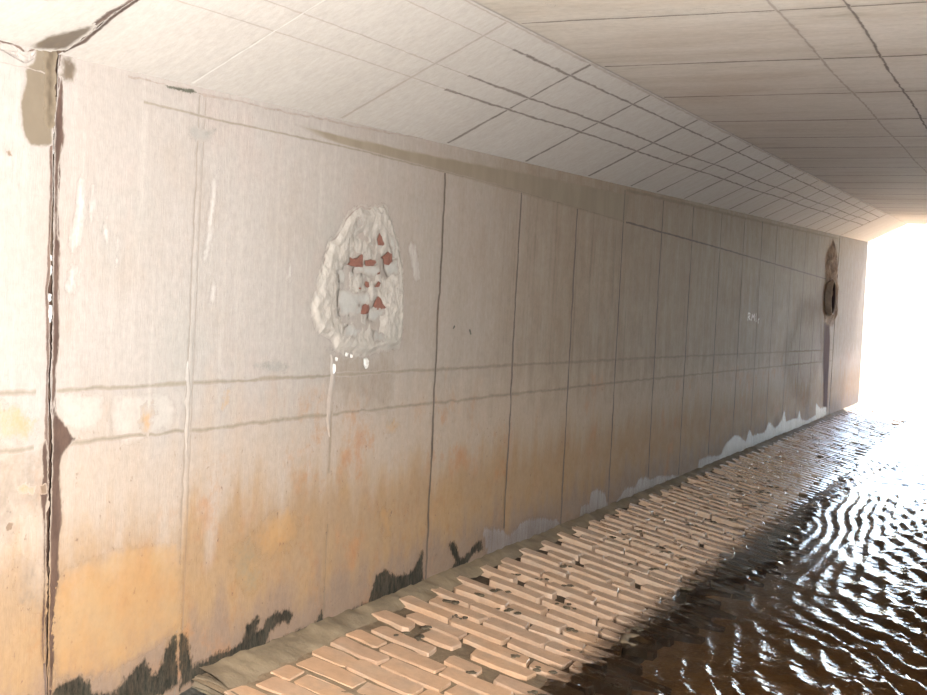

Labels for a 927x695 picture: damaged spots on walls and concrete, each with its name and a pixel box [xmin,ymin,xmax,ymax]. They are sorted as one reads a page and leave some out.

crack [0,0,140,93]
crack [128,75,423,140]
spalling [309,203,404,374]
crack [41,127,61,695]
water stain [482,516,560,554]
water stain [579,473,684,517]